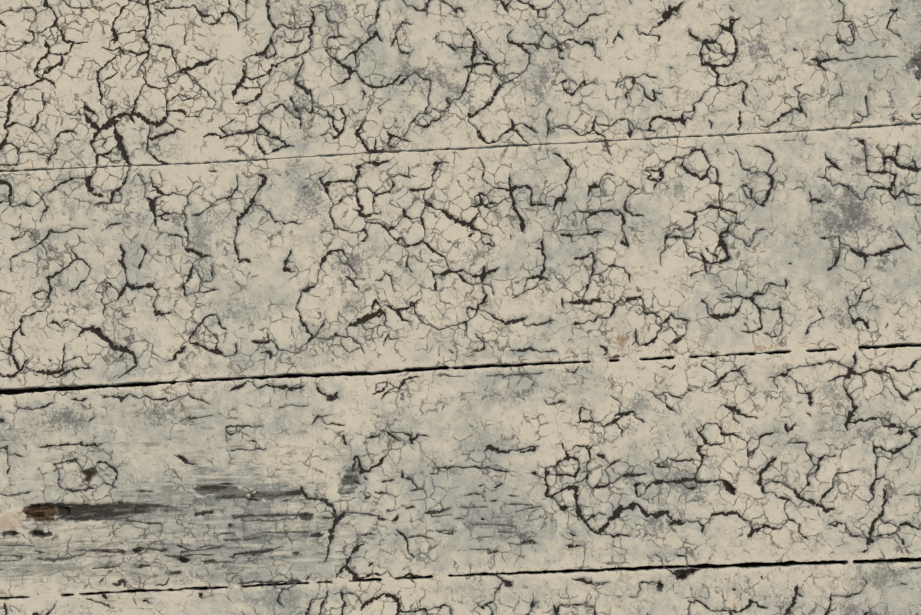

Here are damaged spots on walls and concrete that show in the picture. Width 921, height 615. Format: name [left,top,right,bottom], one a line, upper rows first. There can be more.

crack [0,0,921,451]
peeling [2,501,182,538]
peeling [192,484,303,503]
crack [0,351,921,615]